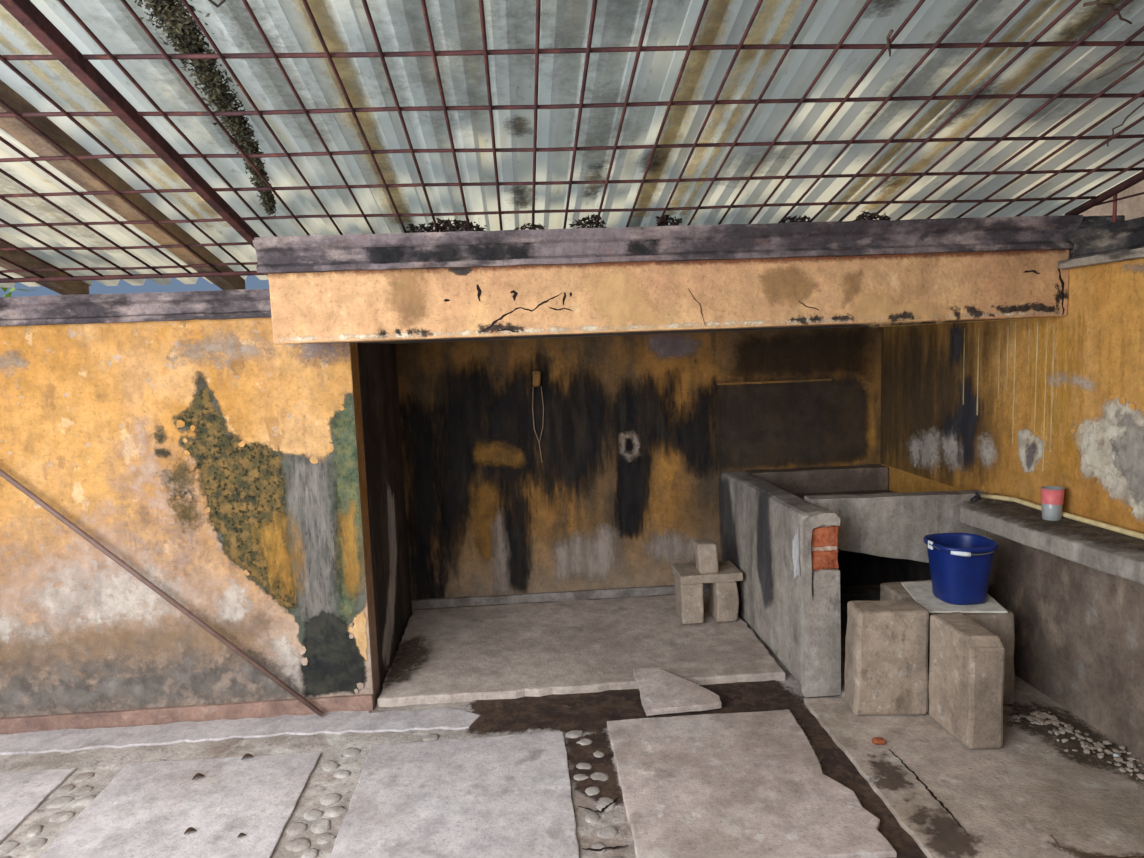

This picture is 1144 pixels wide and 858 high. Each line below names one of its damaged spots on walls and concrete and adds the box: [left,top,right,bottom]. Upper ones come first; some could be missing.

crack [480,293,572,333]
peeling [0,334,368,696]
water stain [383,361,743,671]
water stain [757,490,773,607]
water stain [910,323,996,469]
water stain [998,321,1081,476]
peeling [1070,397,1144,519]
water stain [0,562,307,717]